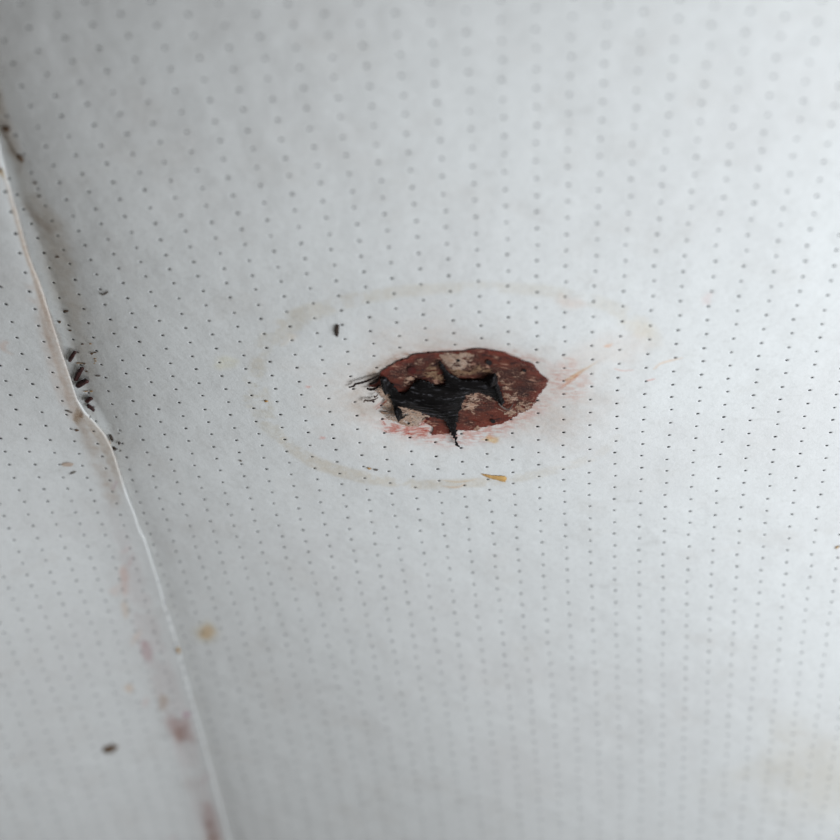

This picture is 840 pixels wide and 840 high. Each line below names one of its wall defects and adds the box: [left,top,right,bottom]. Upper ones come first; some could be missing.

peeling [376,387,430,427]
peeling [403,352,534,417]